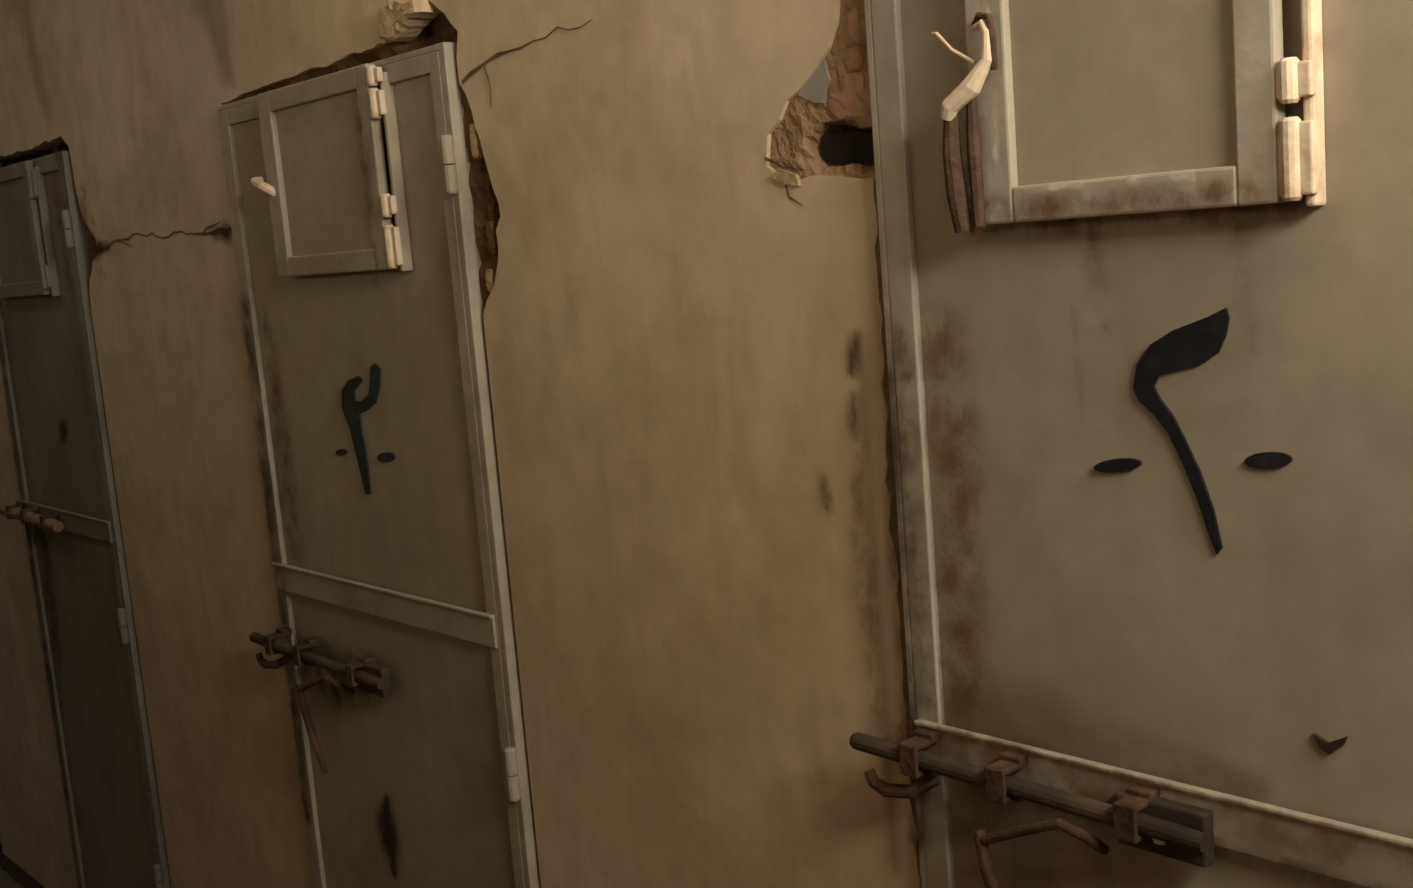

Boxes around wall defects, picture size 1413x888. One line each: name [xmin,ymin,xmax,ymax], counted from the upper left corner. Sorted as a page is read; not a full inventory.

crack [461,19,592,107]
spalling [764,0,875,206]
crack [93,221,231,253]
spalling [458,78,500,320]
rust [883,335,909,505]